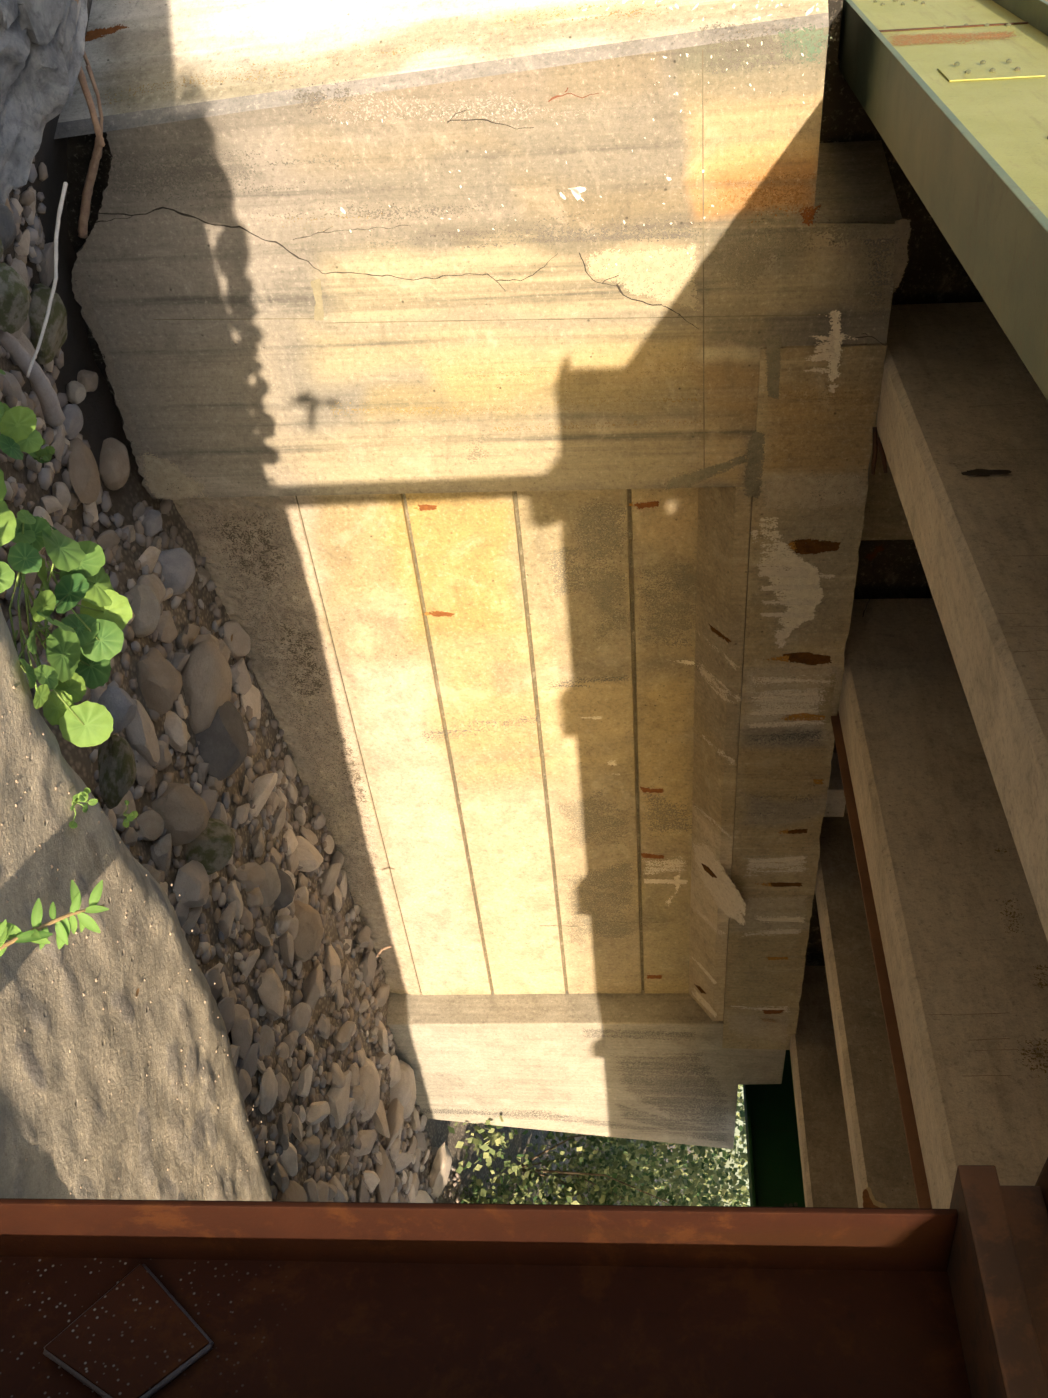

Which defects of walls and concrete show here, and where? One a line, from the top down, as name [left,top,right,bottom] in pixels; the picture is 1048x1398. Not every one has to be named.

rust [85,24,129,42]
leakage [101,138,701,253]
rust [707,159,834,226]
crack [93,207,698,329]
spalling [586,235,701,311]
leakage [780,334,878,412]
rust [787,539,841,555]
leakage [757,564,835,649]
rust [766,652,832,666]